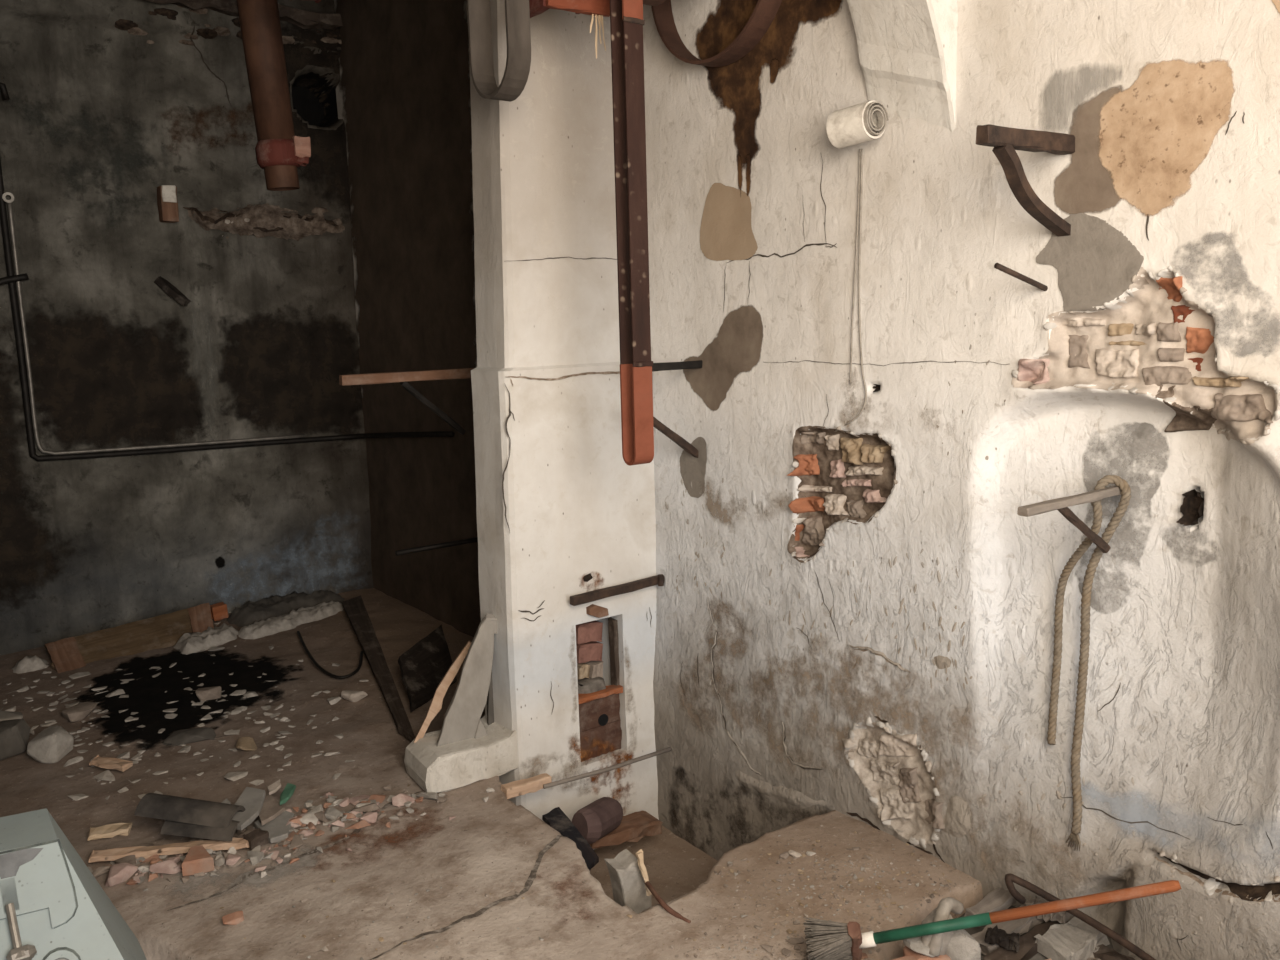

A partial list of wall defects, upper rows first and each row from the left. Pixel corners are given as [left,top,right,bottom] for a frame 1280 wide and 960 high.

flaking render [183,203,345,241]
flaking render [700,183,758,261]
flaking render [683,305,763,411]
water stain [0,309,363,606]
flaking render [769,426,898,576]
flaking render [842,717,945,848]
crack [369,835,563,960]
crack [1060,796,1280,902]